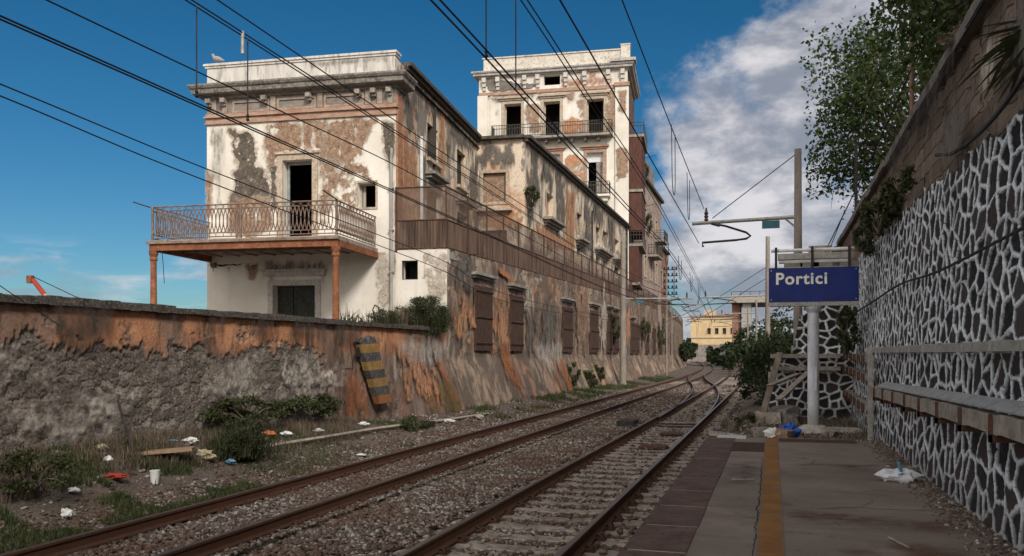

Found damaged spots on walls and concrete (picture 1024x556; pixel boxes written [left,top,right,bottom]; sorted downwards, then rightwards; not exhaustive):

flaking render [227,89,451,238]
spalling [0,341,45,381]
spalling [219,354,257,397]
spalling [279,355,343,398]
spalling [14,392,134,444]